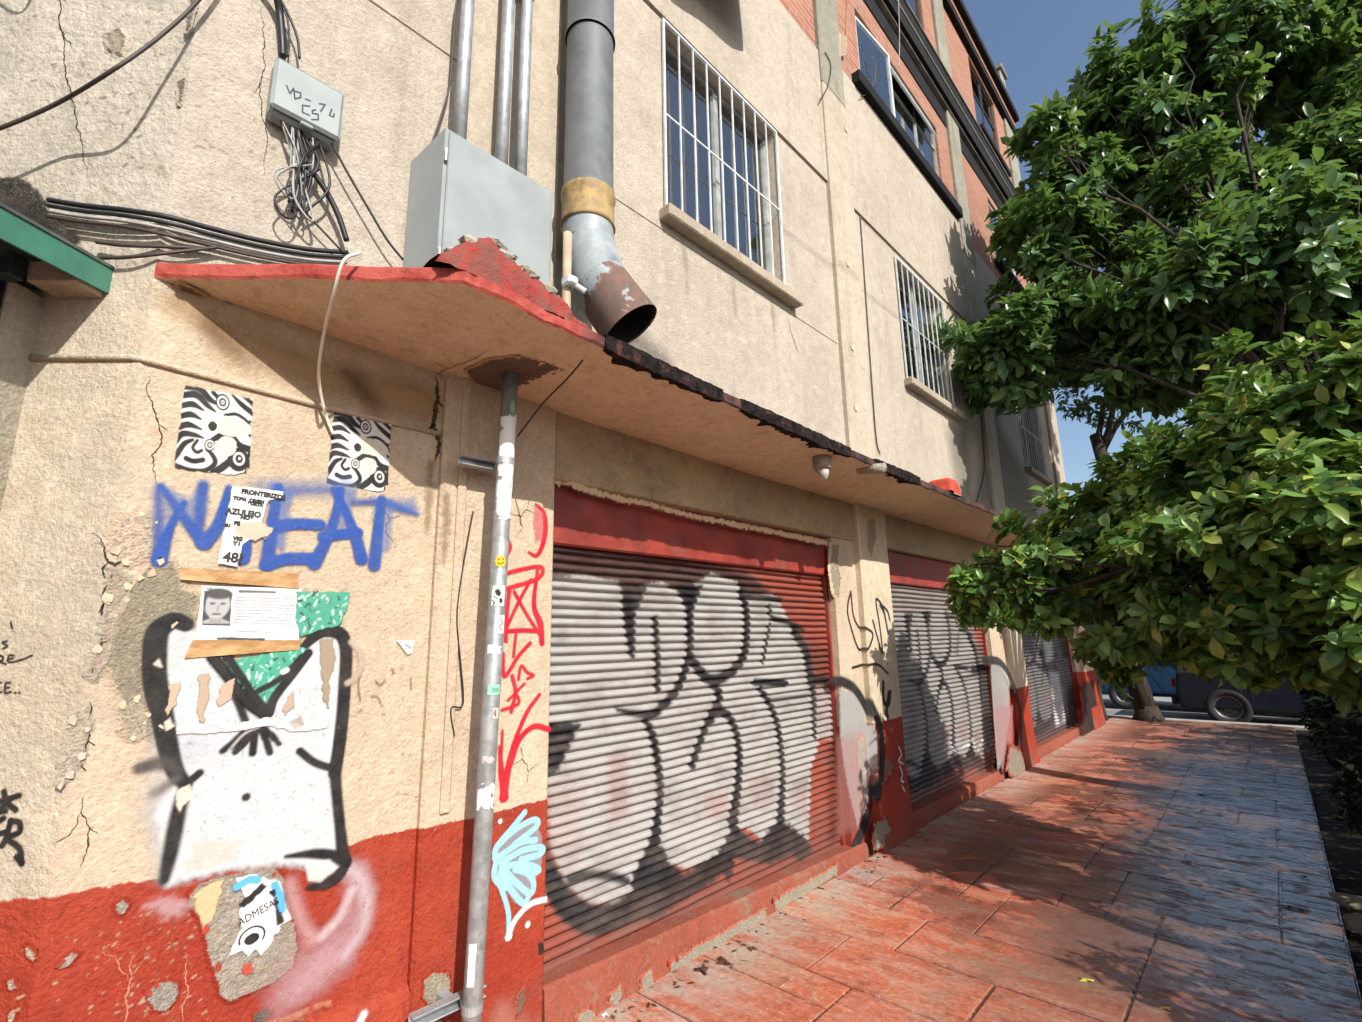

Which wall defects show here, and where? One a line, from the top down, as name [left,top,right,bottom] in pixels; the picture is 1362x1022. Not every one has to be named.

crack [58,0,88,173]
spalling [443,233,559,296]
peeling [81,508,201,747]
peeling [53,701,96,790]
spalling [3,976,23,1022]
spalling [22,940,38,963]
spalling [54,949,84,984]
spalling [420,970,452,1006]
spalling [574,862,838,1022]